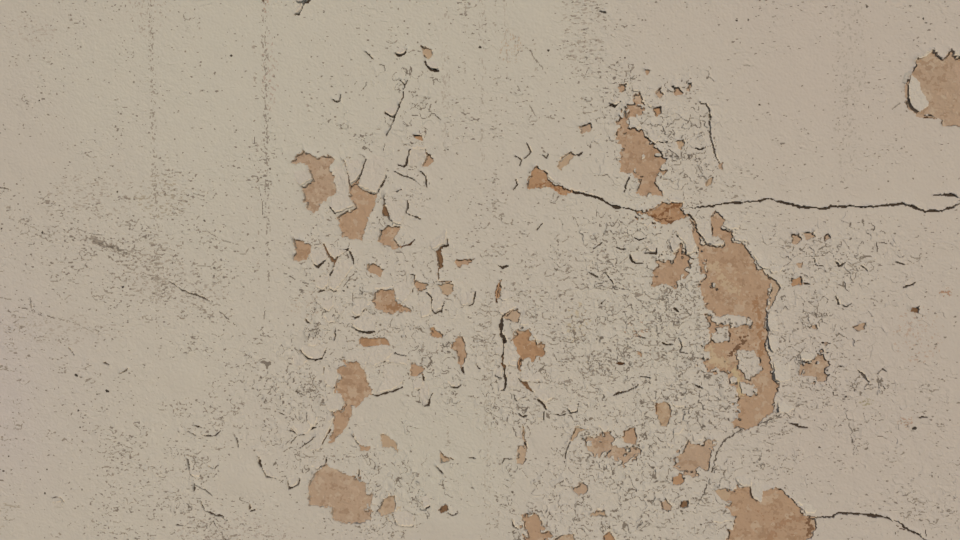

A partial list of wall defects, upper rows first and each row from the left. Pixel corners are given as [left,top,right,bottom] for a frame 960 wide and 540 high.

peeling [899,48,960,127]
peeling [20,158,249,311]
crack [680,193,960,246]
crack [804,242,917,288]
peeling [74,371,249,540]
crack [694,414,808,509]
crack [807,512,927,539]